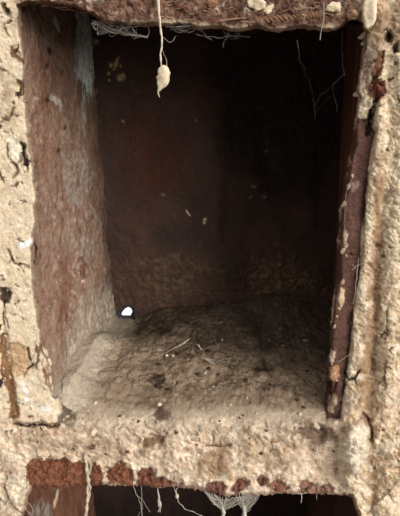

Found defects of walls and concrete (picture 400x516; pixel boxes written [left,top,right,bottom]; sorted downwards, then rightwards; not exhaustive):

spalling [353,31,387,101]
spalling [0,325,54,418]
crack [15,423,56,437]